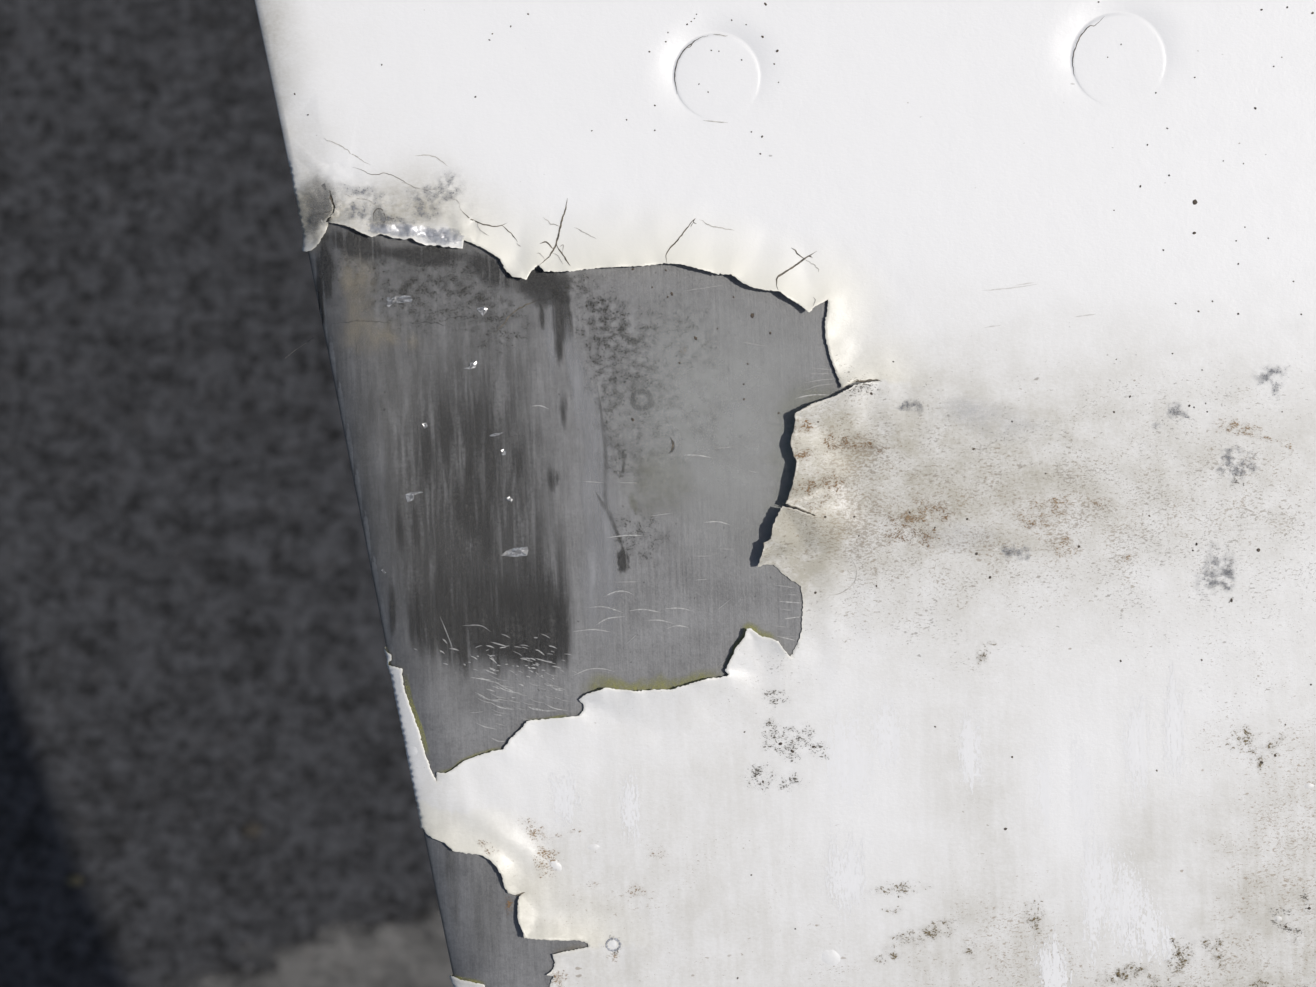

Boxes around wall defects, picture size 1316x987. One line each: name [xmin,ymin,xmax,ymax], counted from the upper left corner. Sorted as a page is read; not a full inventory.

peeling [297,162,952,987]
damp [1032,733,1176,987]